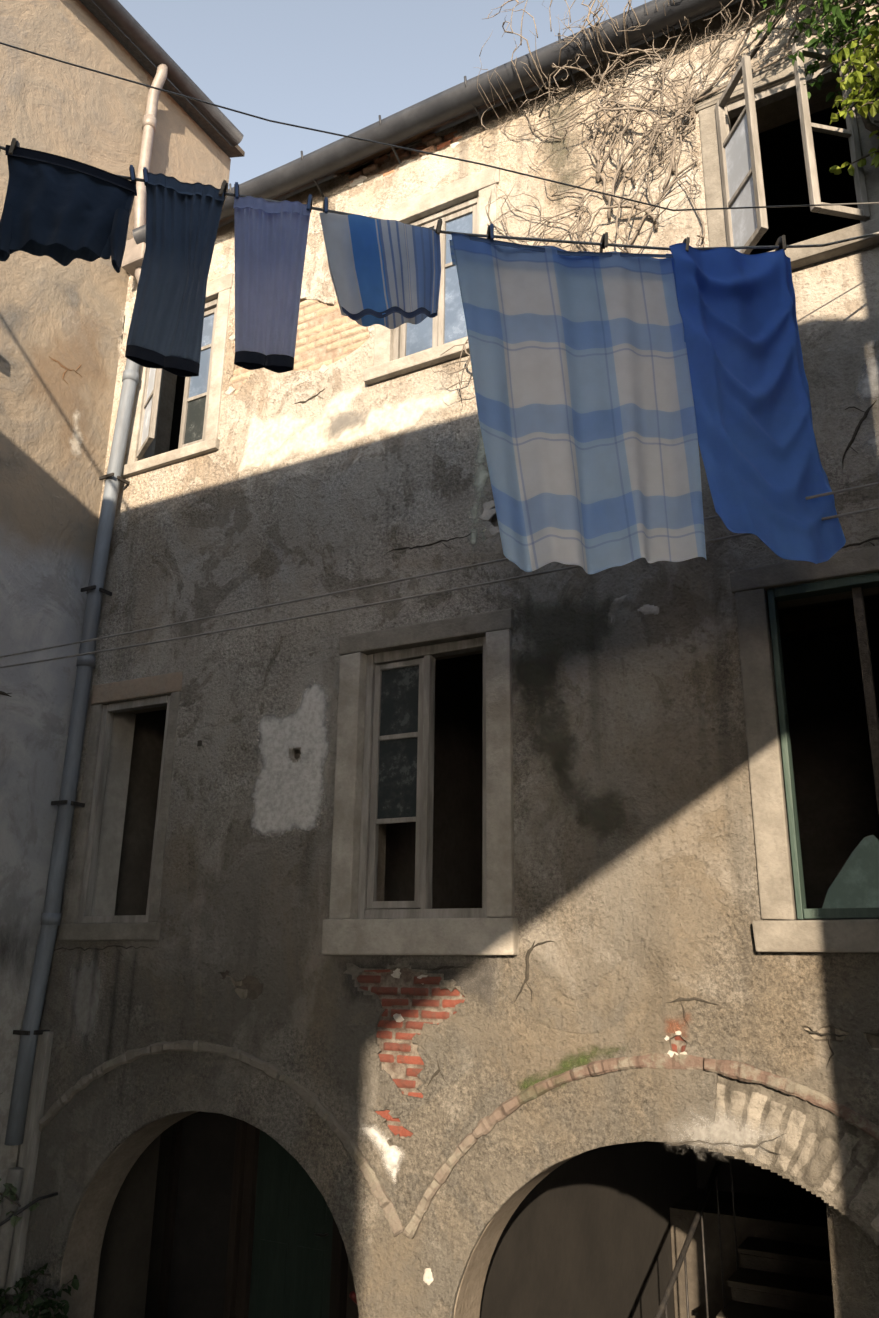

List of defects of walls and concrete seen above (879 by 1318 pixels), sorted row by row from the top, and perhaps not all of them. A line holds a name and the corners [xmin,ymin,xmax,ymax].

flaking render [225,335,256,396]
flaking render [291,290,370,374]
crack [842,401,876,470]
spalling [479,500,499,536]
leakage [518,600,623,834]
crack [514,940,554,1002]
flaking render [320,958,470,1149]
flaking render [803,1022,857,1047]